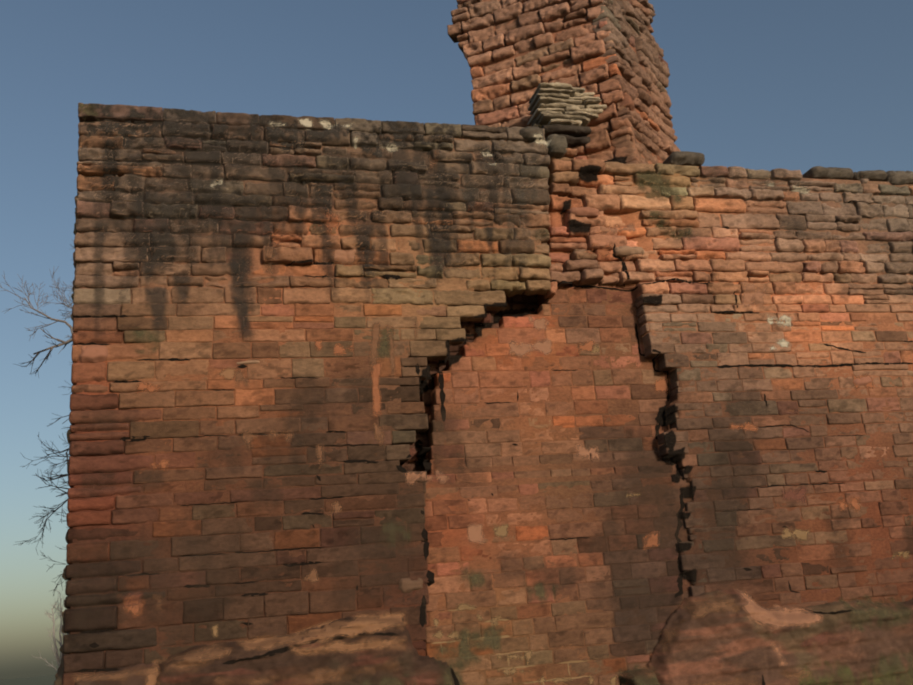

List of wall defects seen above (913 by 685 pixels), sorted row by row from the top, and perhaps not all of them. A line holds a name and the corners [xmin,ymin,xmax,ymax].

leakage [85,103,473,331]
crack [635,323,686,598]